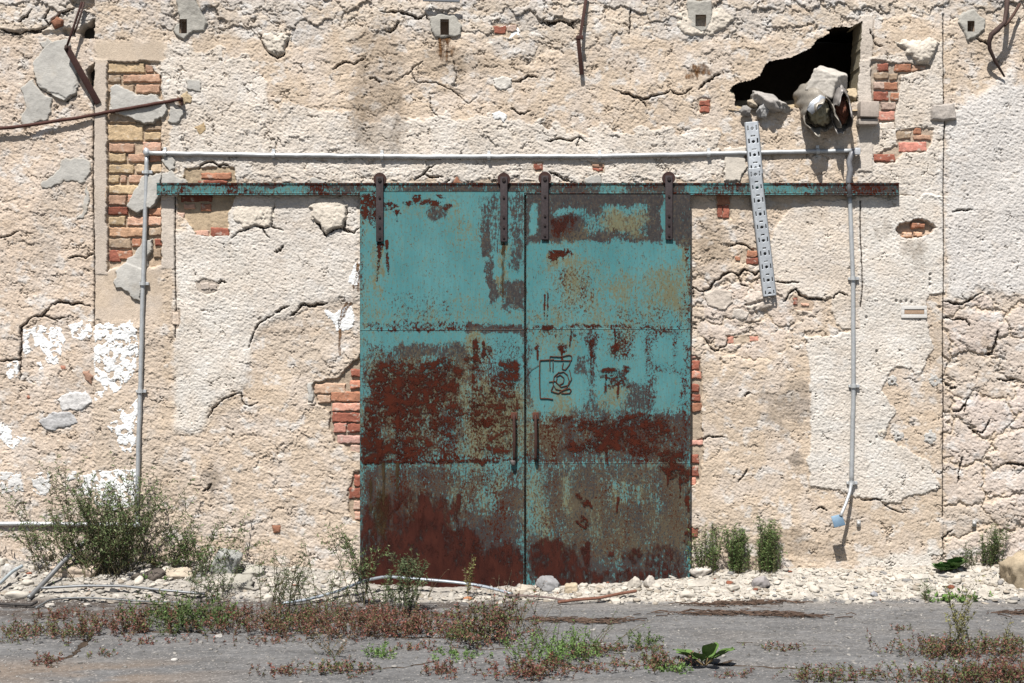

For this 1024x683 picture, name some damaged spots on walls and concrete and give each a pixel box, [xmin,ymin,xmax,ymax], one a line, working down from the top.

crack [613,74,720,108]
spalling [870,60,933,164]
spalling [105,61,162,272]
crack [0,80,96,378]
rust [548,250,570,264]
crack [692,201,863,307]
spalling [896,219,934,239]
crack [942,15,990,549]
peeling [6,320,139,401]
spalling [313,356,360,453]
rust [557,325,630,398]
rust [360,338,690,604]